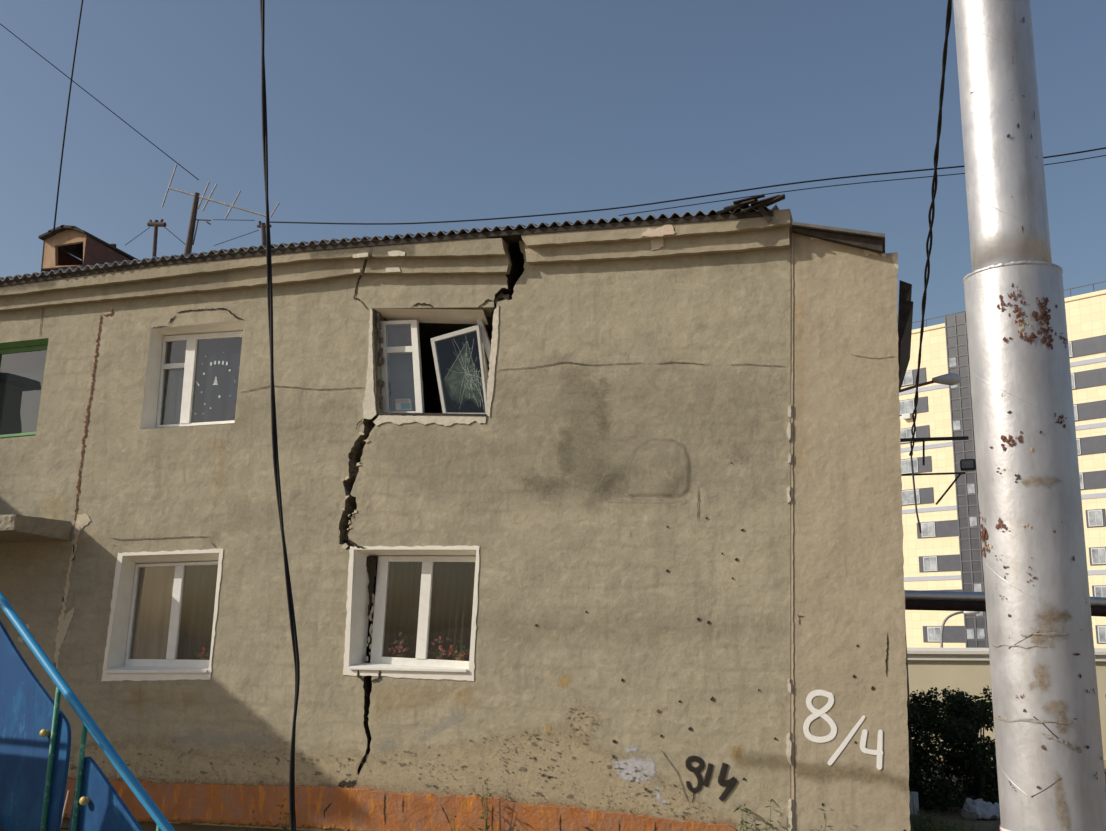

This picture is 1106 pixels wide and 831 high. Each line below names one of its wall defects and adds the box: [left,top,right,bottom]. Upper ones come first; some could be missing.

crack [477,227,525,316]
crack [496,232,792,372]
rust [997,283,1068,350]
crack [74,309,113,526]
rust [990,431,1033,451]
spalling [0,513,91,669]
crack [324,670,381,817]
crack [383,796,404,823]
spalling [69,706,720,824]